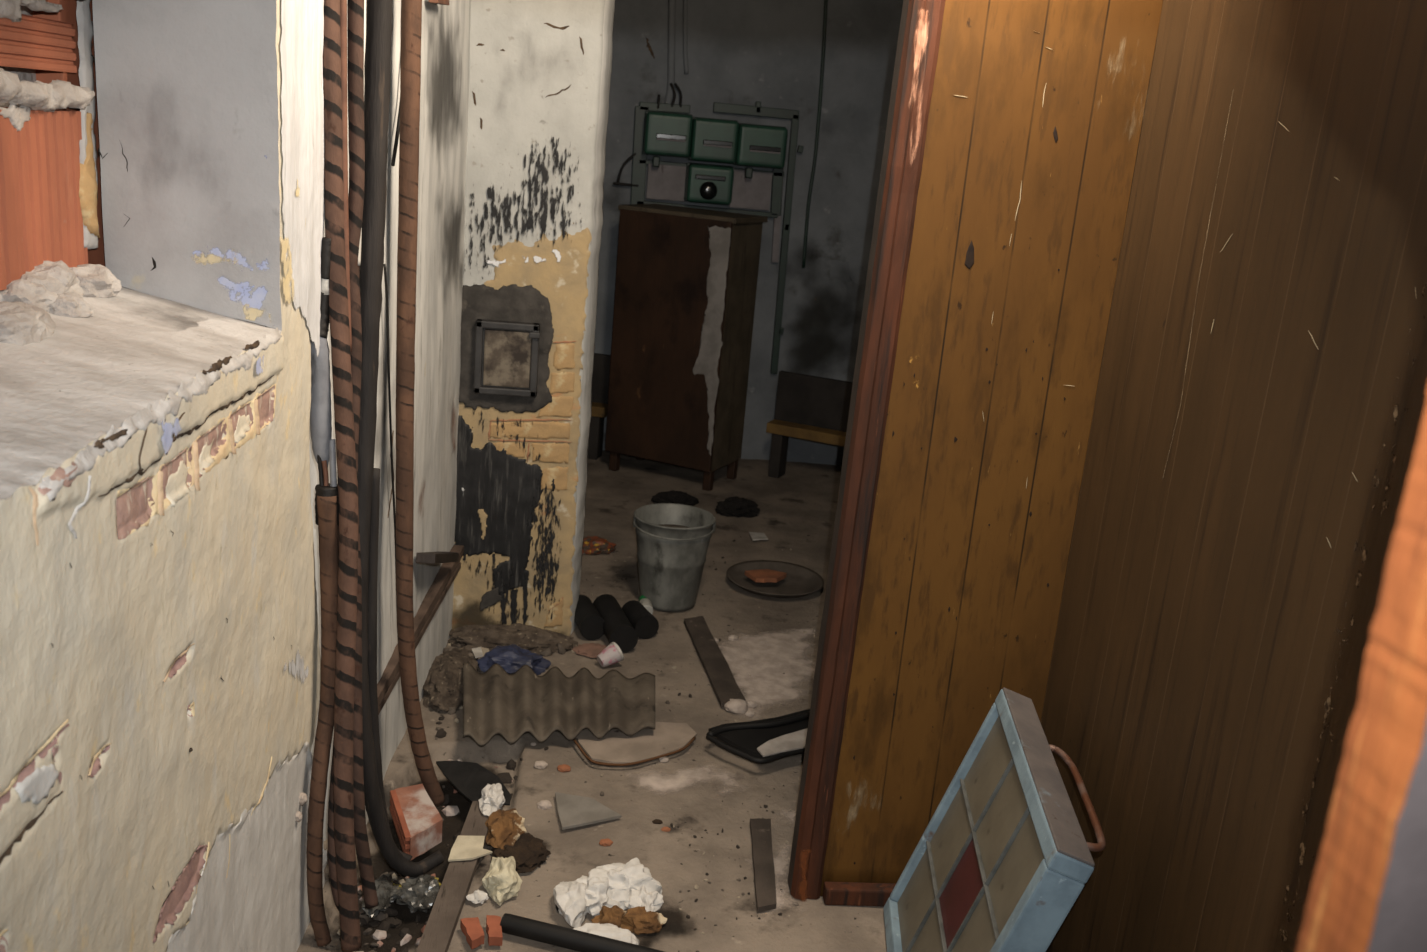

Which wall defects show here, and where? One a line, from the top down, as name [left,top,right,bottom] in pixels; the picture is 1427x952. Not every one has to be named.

peeling [37,0,325,540]
peeling [452,228,592,636]
spalling [88,743,112,778]
spalling [164,643,195,682]
spalling [153,742,328,952]